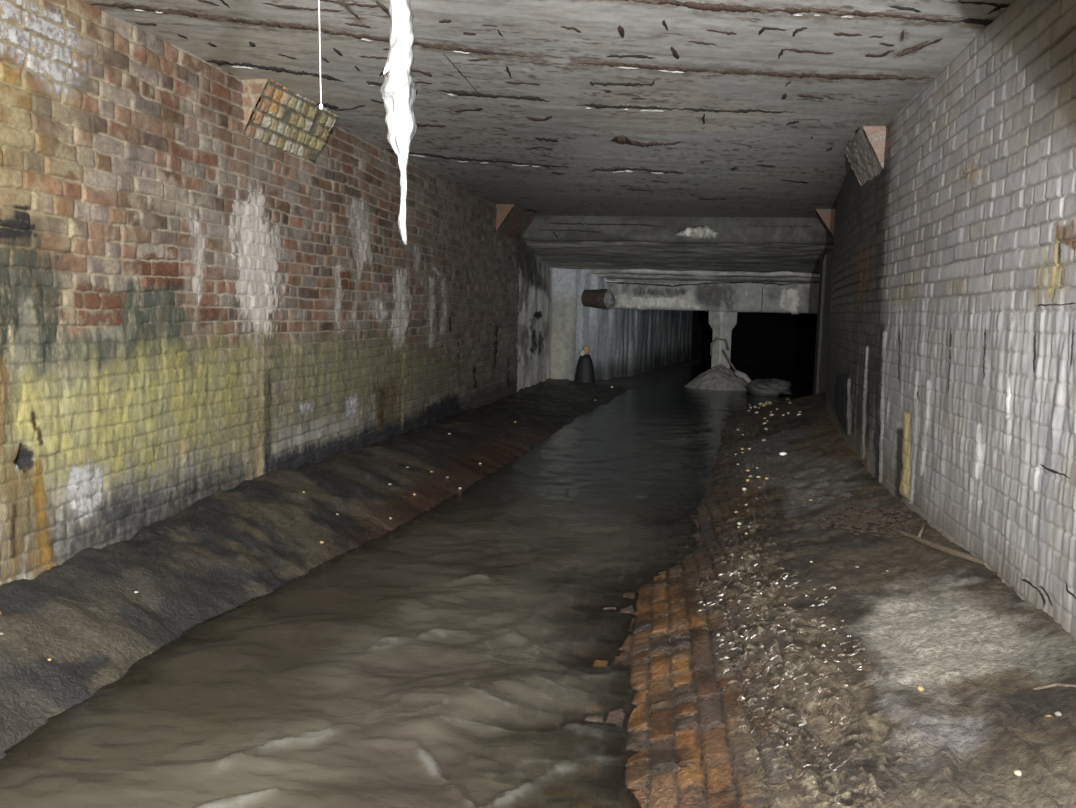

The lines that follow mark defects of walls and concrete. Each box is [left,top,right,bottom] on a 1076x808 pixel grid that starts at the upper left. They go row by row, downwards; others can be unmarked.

efflorescence [0,0,86,93]
crack [84,0,705,191]
crack [571,0,1010,152]
crack [524,164,809,240]
efflorescence [187,211,212,302]
rust [0,361,54,585]
hole [14,411,43,470]
leakage [64,459,227,552]
leakage [228,187,466,478]
leakage [833,325,932,504]
leakage [1006,320,1015,418]
crack [1021,579,1076,607]